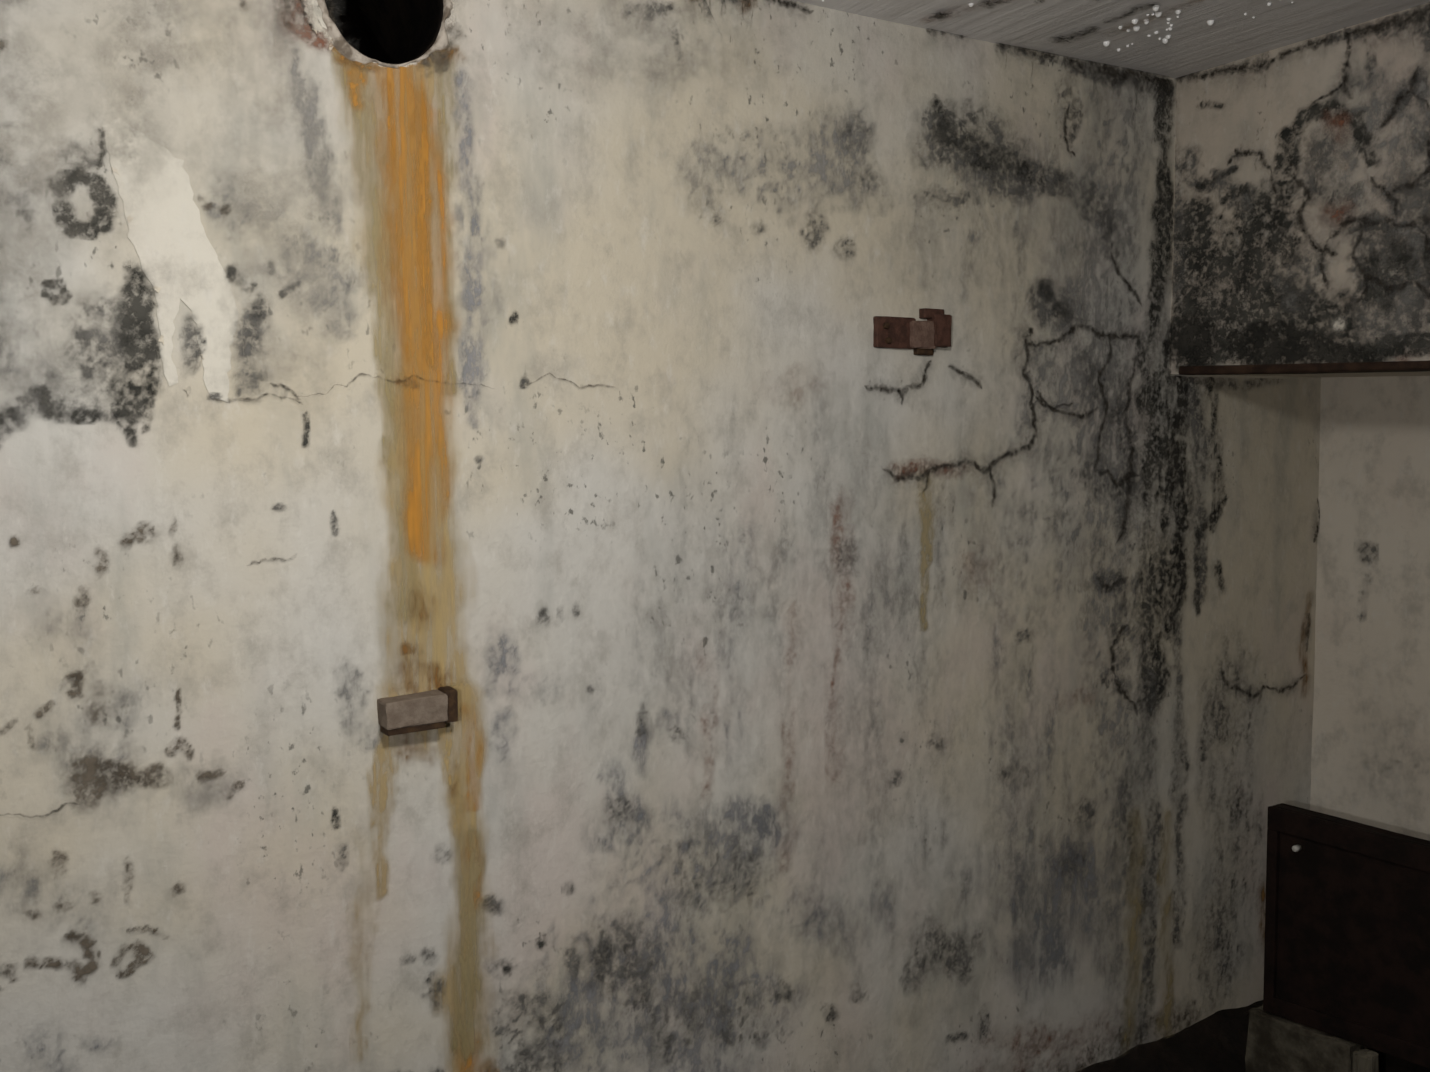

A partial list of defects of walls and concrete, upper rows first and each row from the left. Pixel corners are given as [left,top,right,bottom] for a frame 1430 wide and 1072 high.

damp [0,129,116,240]
crack [1064,107,1075,156]
crack [1228,68,1430,301]
damp [0,266,161,446]
damp [185,317,206,365]
damp [227,262,274,396]
crack [865,360,982,405]
crack [885,252,1140,541]
rust [284,0,499,1072]
damp [921,46,1430,1072]
crack [1110,626,1137,711]
damp [495,804,791,1072]